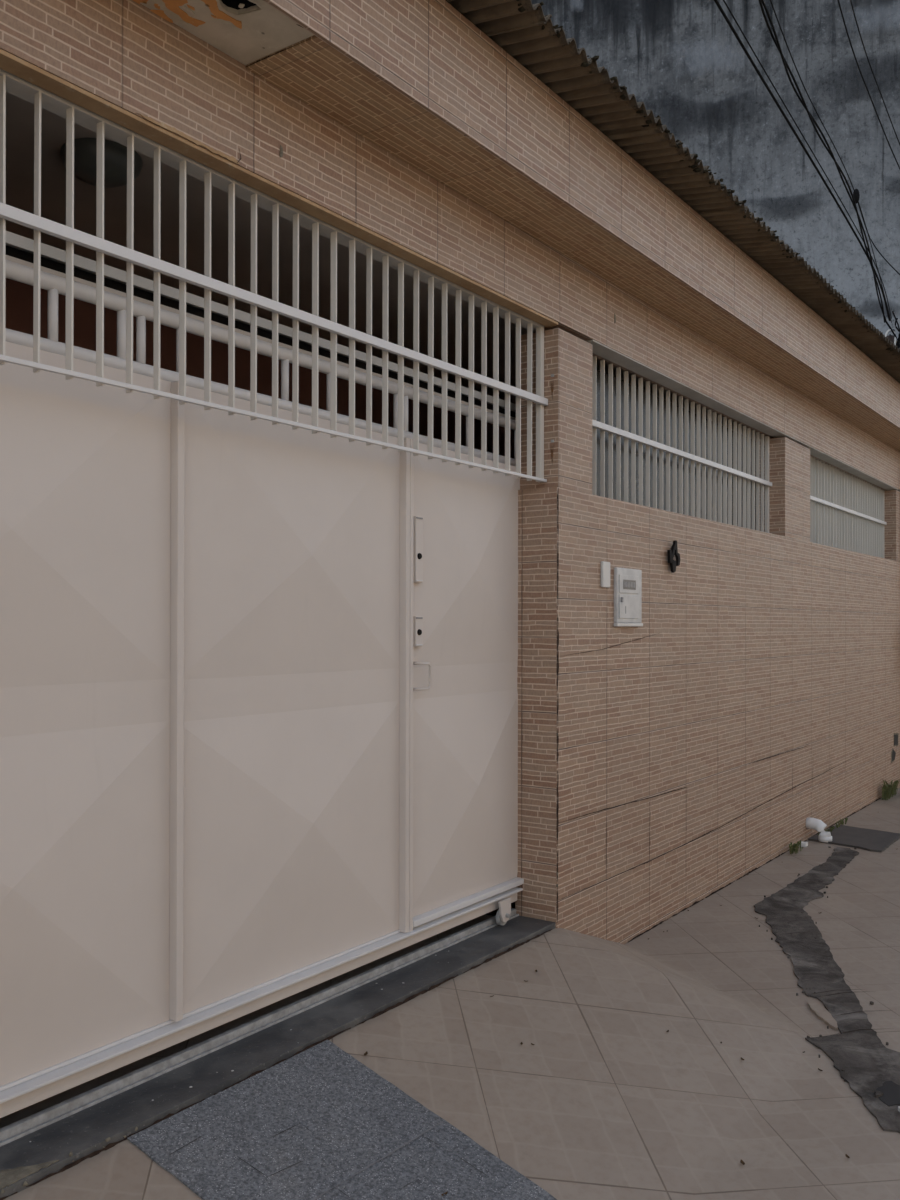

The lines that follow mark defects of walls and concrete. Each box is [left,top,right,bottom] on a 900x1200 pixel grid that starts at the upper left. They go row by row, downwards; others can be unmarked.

peeling [133,0,314,67]